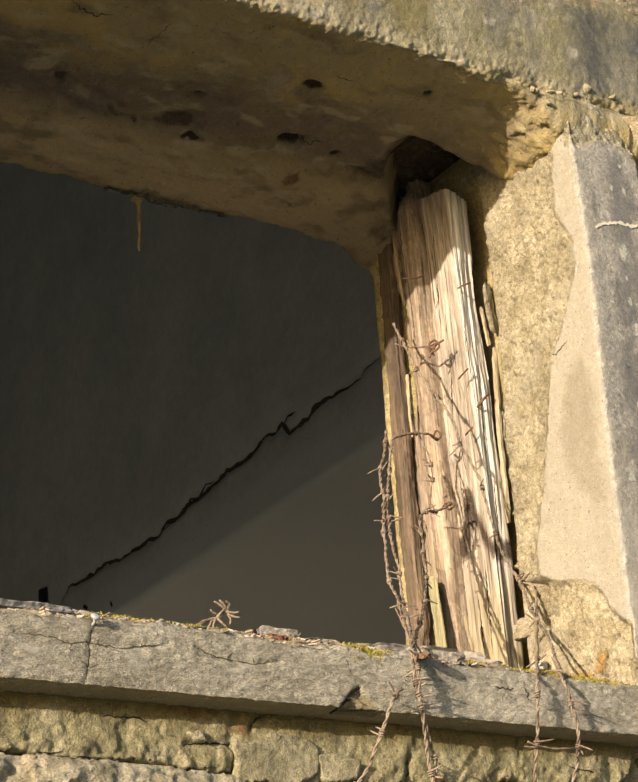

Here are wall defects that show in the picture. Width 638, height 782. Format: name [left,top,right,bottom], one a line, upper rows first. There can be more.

crack [60,356,381,605]
spalling [476,152,638,685]
crack [18,626,169,684]
crack [330,655,361,714]